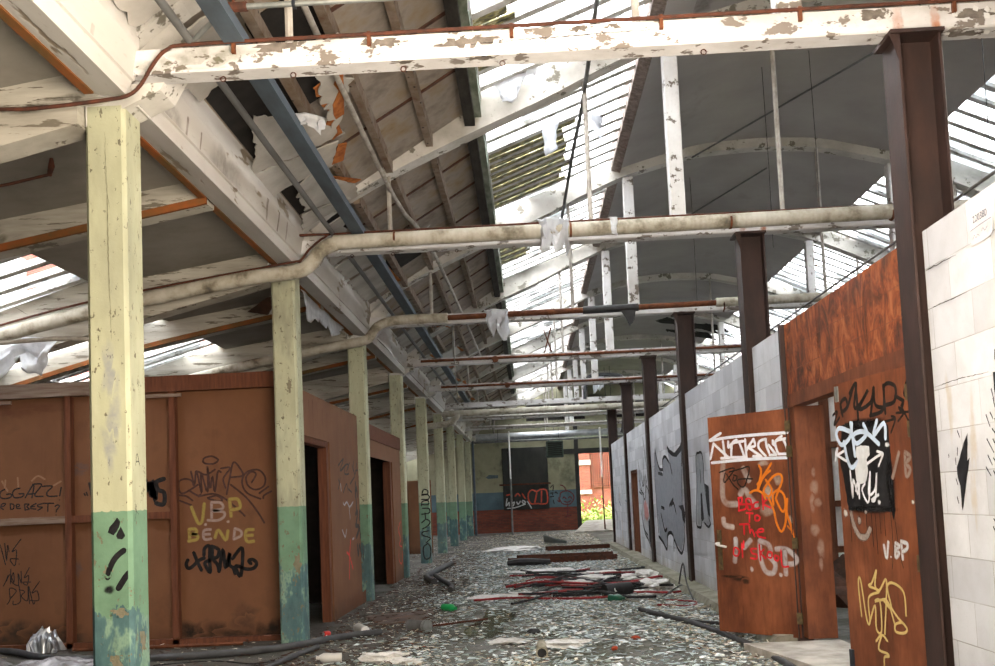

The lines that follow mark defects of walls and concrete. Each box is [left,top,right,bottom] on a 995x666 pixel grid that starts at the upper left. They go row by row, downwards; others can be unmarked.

peeling [852,8,894,21]
peeling [941,5,995,37]
peeling [568,22,624,34]
peeling [251,41,308,54]
peeling [360,37,407,49]
peeling [433,33,504,61]